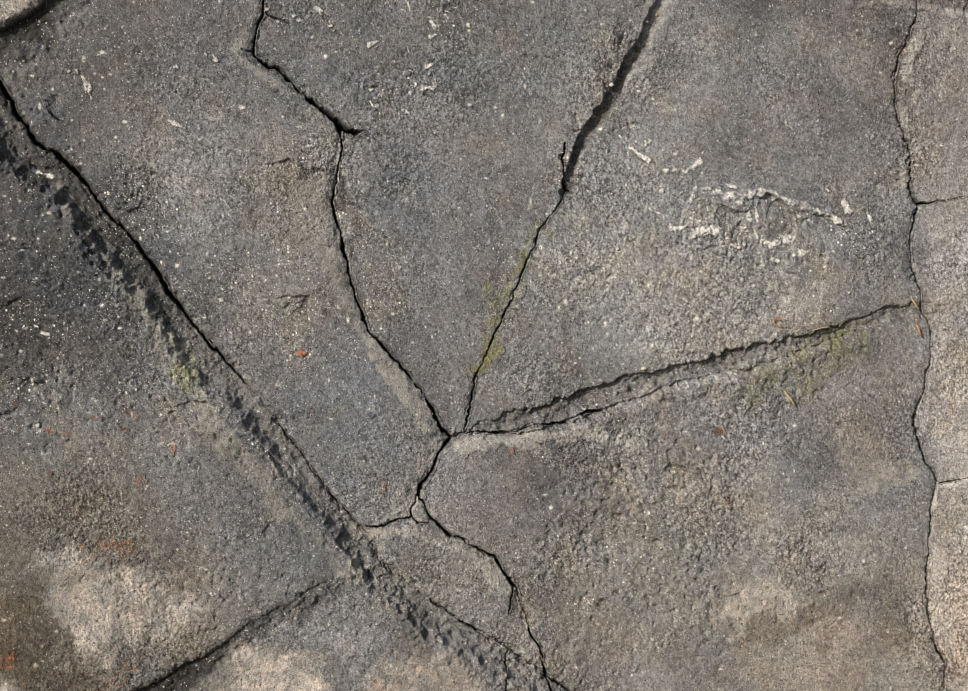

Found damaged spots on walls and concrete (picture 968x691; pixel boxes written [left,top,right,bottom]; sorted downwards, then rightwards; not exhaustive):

crack [0,78,246,384]
crack [226,0,606,691]
crack [893,0,968,691]